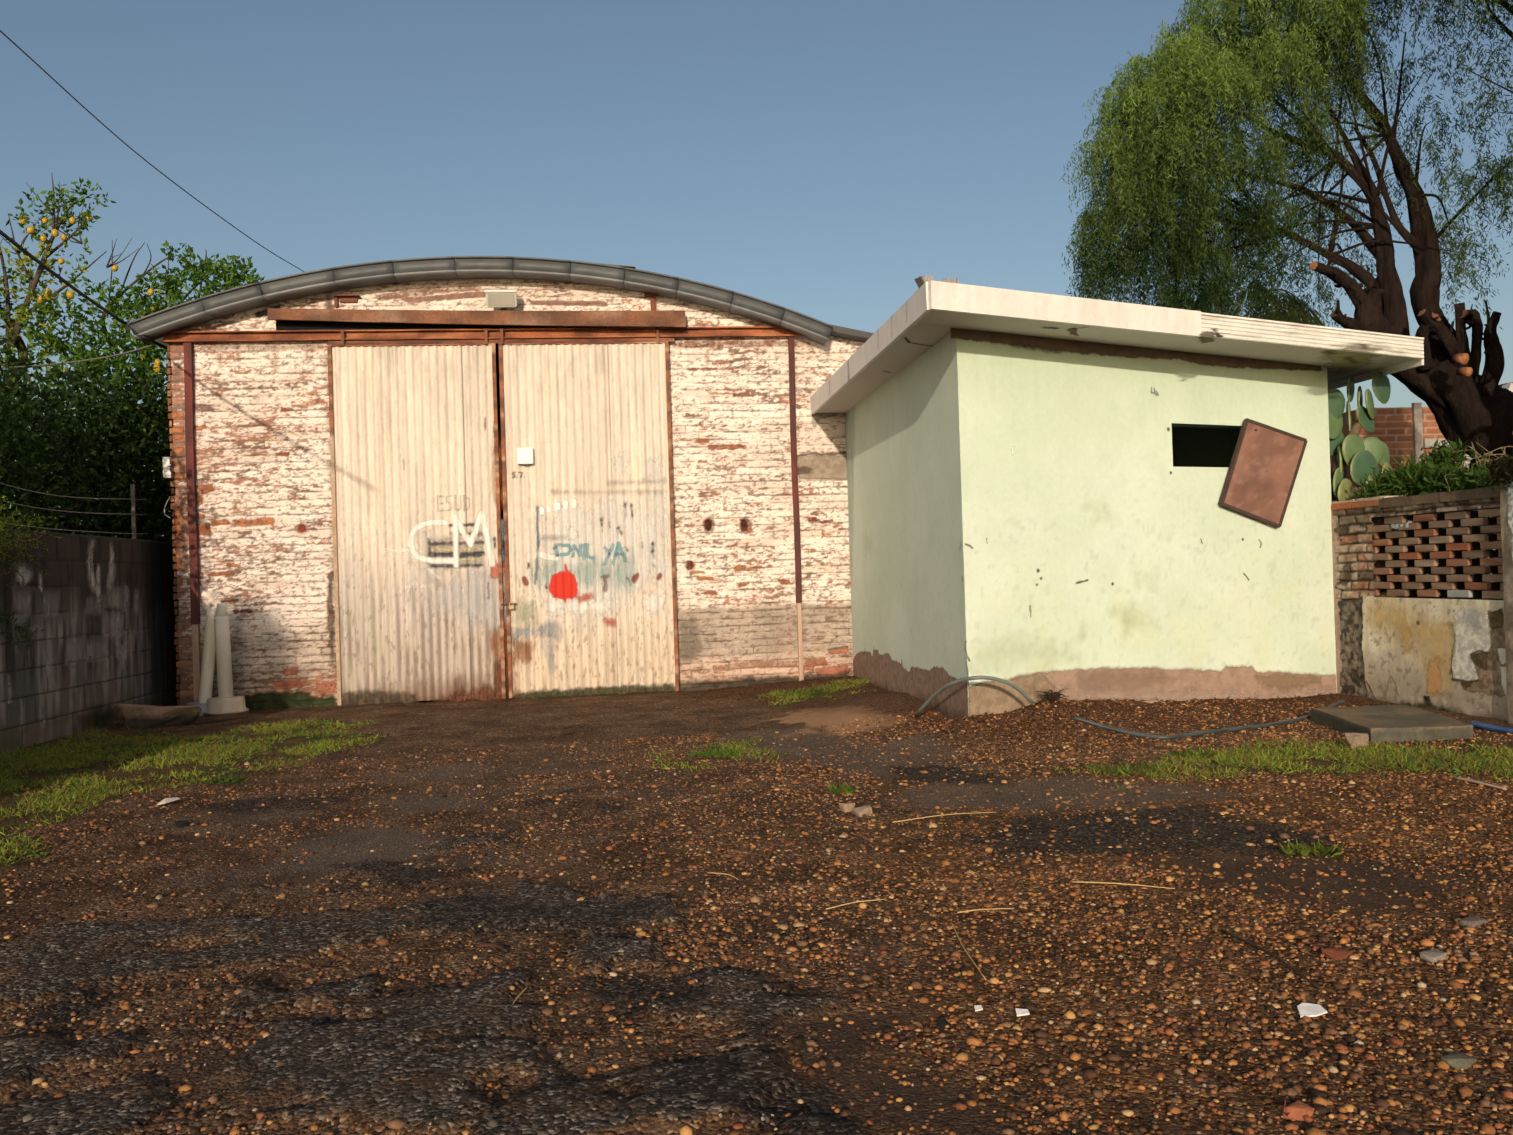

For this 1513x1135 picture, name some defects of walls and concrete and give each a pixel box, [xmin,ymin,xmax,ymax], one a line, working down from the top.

peeling [687,360,733,371]
peeling [696,439,746,463]
peeling [174,475,274,585]
spalling [703,518,714,533]
spalling [739,519,752,534]
water stain [16,566,42,592]
water stain [67,542,128,666]
spalling [327,572,335,658]
peeling [685,561,716,595]
corrosion [442,632,531,702]
flaking render [713,647,1054,720]
peeling [1452,608,1507,698]